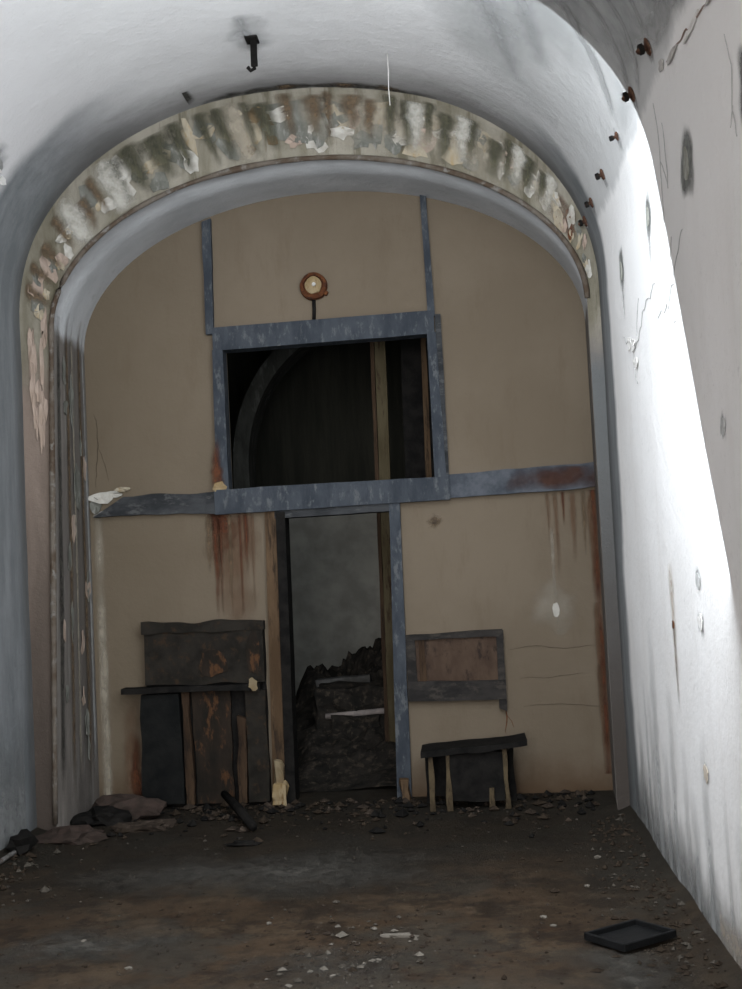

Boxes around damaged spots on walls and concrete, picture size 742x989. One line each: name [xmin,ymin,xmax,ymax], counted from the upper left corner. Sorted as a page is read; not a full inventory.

damp [558,0,674,105]
peeling [27,96,592,455]
crack [624,104,682,384]
corrosion [206,514,254,601]
corrosion [536,466,611,774]
damp [0,766,27,851]
damp [636,792,742,969]
damp [590,950,660,989]